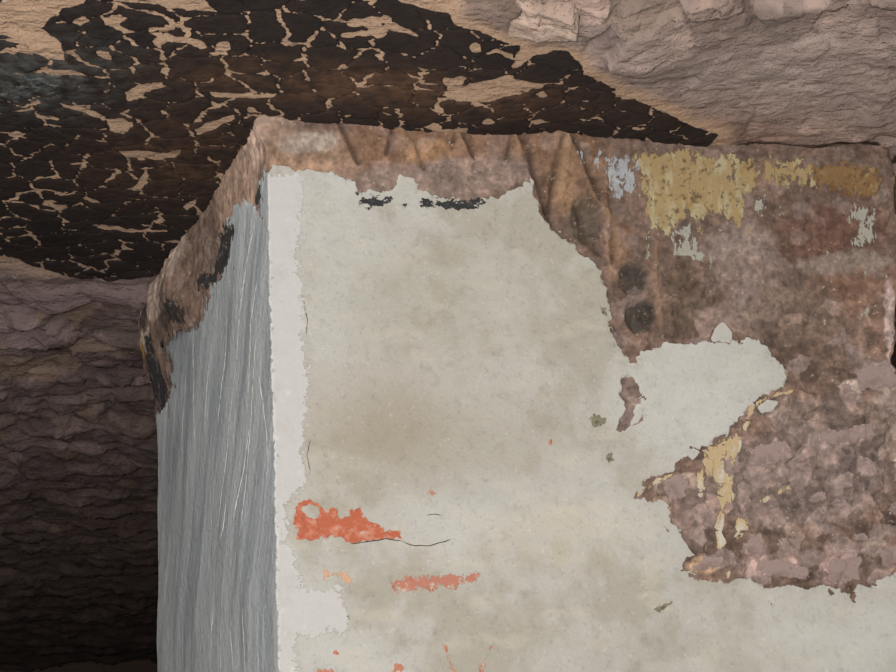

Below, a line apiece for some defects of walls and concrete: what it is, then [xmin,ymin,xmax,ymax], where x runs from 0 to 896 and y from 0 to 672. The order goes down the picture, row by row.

water stain [355,191,393,210]
water stain [420,197,486,212]
water stain [194,219,234,292]
water stain [144,333,168,410]
water stain [217,224,268,538]
flaking render [616,376,647,432]
flaking render [634,341,896,603]